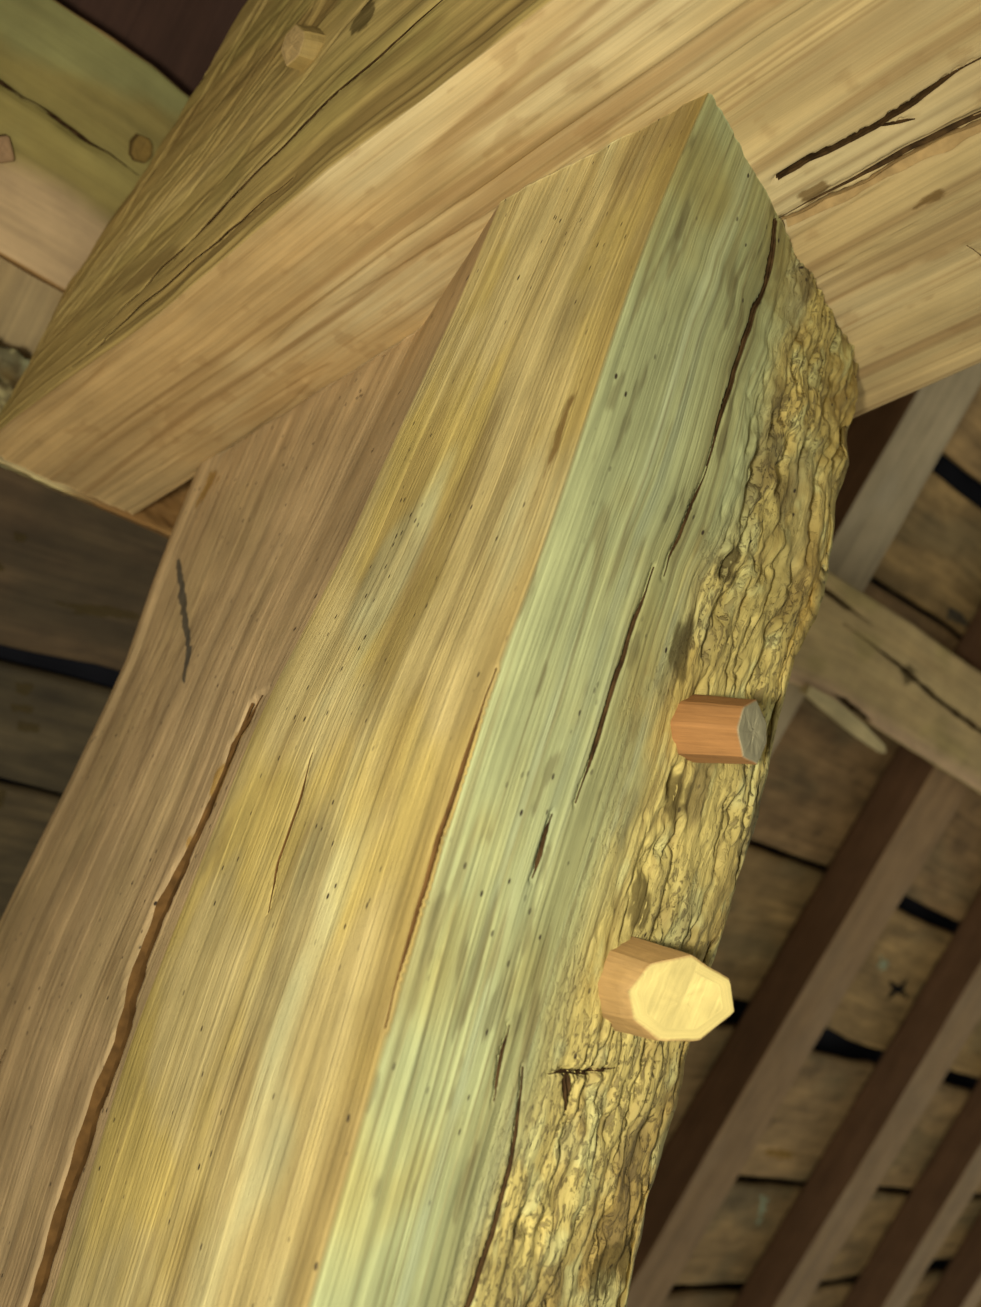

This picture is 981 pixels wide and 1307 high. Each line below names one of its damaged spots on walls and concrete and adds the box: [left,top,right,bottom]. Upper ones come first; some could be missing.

crack [0,80,139,176]
crack [532,57,981,878]
crack [28,695,263,1307]
crack [464,1025,615,1307]